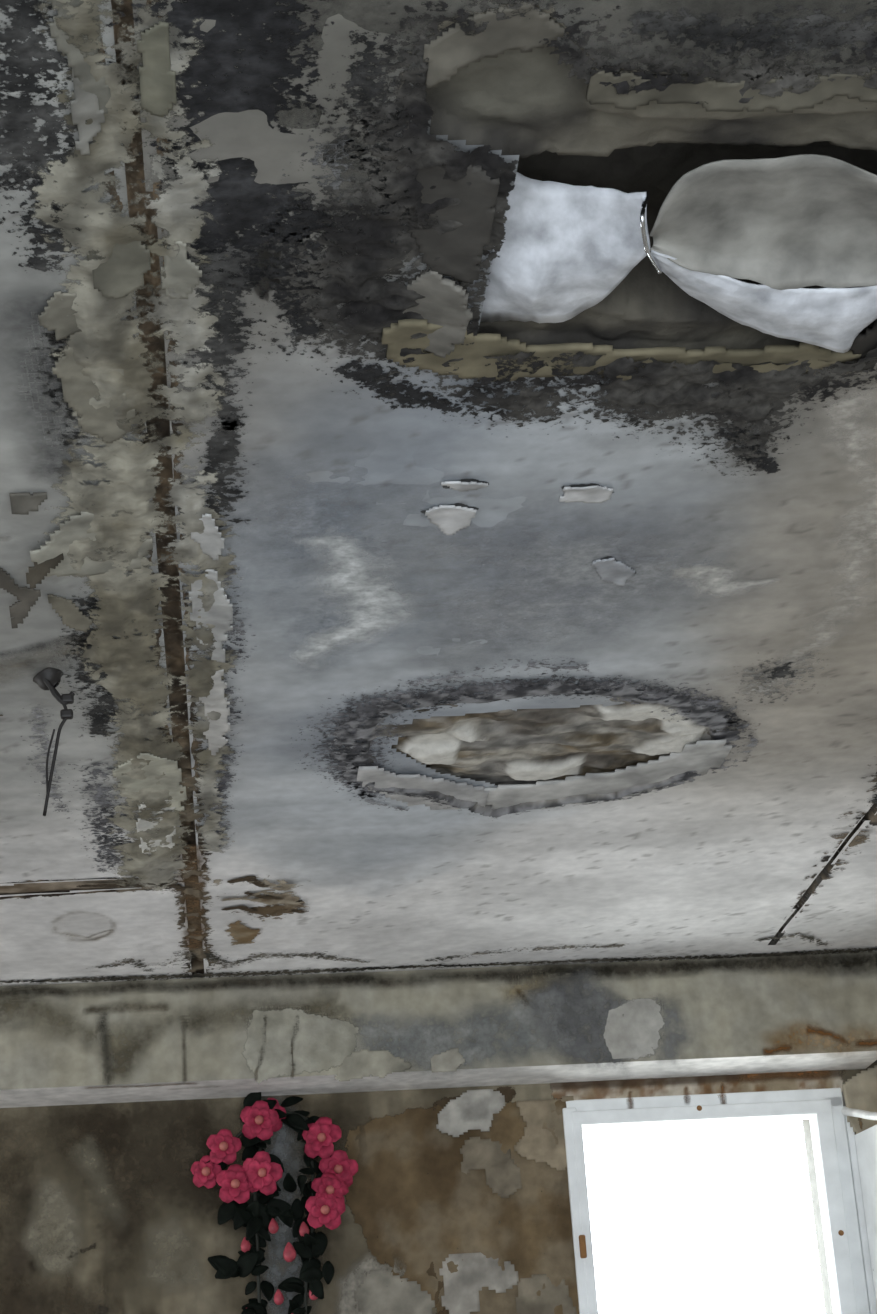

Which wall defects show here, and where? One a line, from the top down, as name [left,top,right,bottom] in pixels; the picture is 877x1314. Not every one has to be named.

water stain [0,0,86,274]
spalling [373,0,877,382]
crack [0,0,214,978]
peeling [421,479,489,535]
water stain [101,0,877,849]
crack [769,765,877,945]
peeling [242,1007,412,1084]
water stain [0,932,877,1084]
peeling [603,998,665,1060]
water stain [0,1102,245,1314]
water stain [246,1107,359,1314]
spalling [339,1087,579,1314]